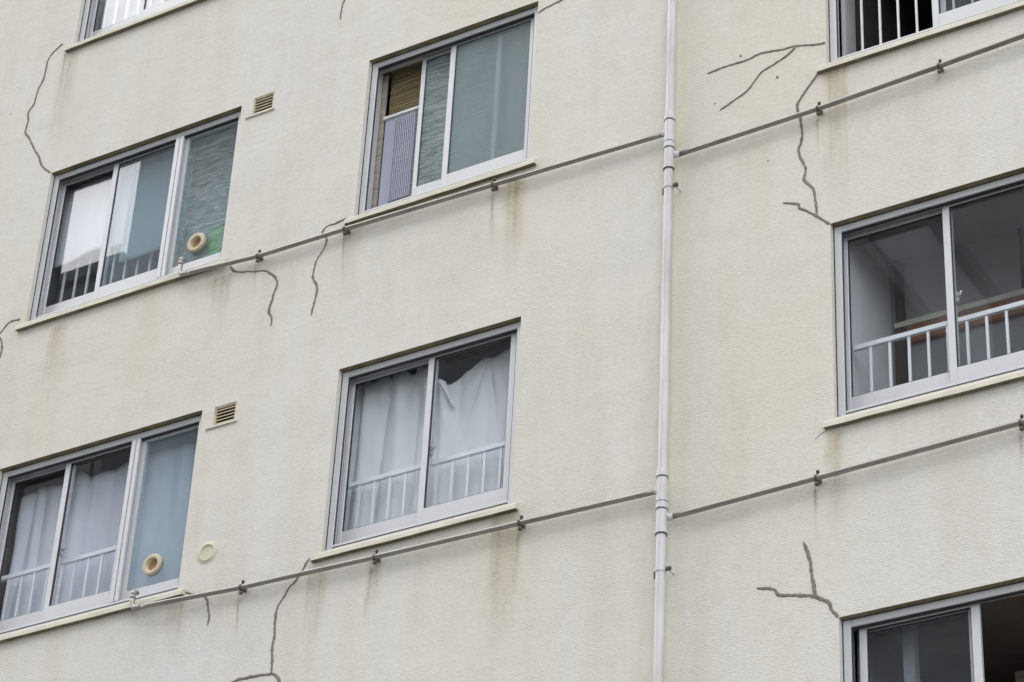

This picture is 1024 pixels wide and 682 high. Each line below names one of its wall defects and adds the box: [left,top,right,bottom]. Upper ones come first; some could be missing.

crack [24,43,63,173]
crack [707,42,825,110]
crack [783,73,830,225]
crack [0,318,20,358]
crack [229,265,278,326]
crack [311,218,346,316]
crack [231,557,310,682]
crack [756,541,839,618]